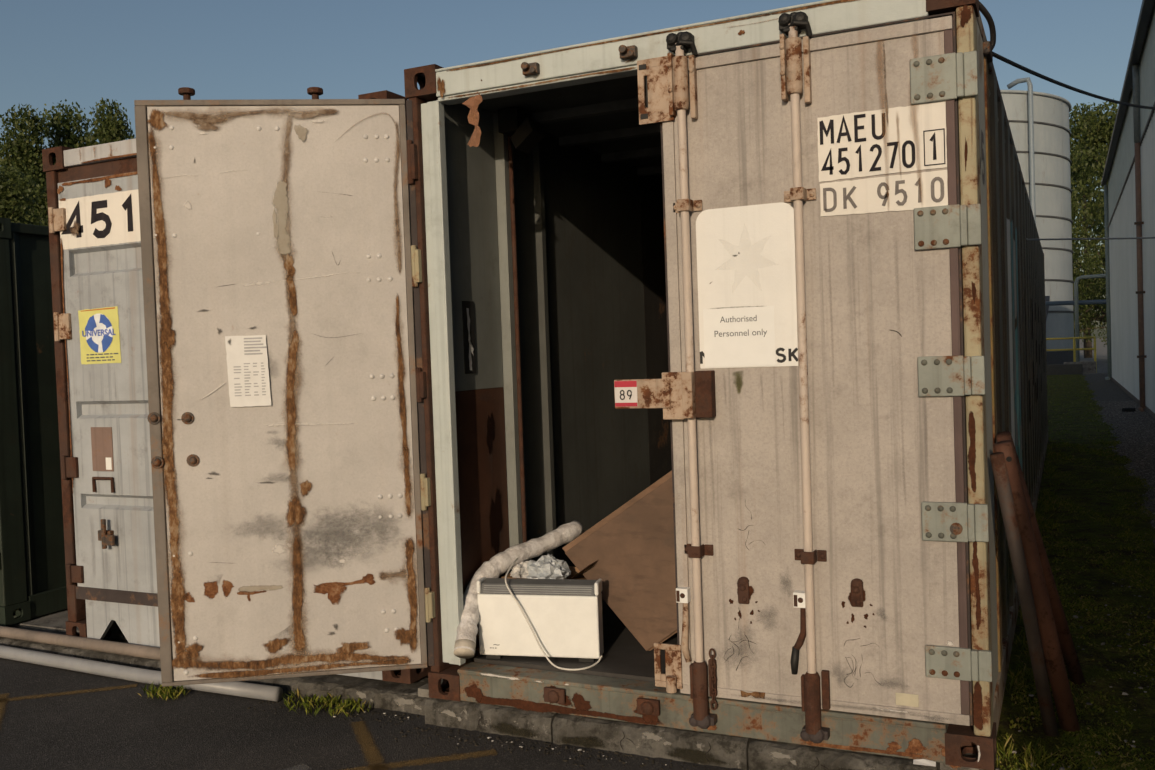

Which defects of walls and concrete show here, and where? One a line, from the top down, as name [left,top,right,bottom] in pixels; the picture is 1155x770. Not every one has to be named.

rust [437,0,856,98]
peeling [294,125,307,141]
rust [57,171,138,201]
peeling [273,181,291,254]
rust [81,109,417,678]
rust [968,411,976,492]
rust [729,583,760,624]
rust [841,589,874,628]
rust [972,541,981,630]
rust [464,684,661,726]
rust [973,681,983,730]
rust [804,739,928,758]